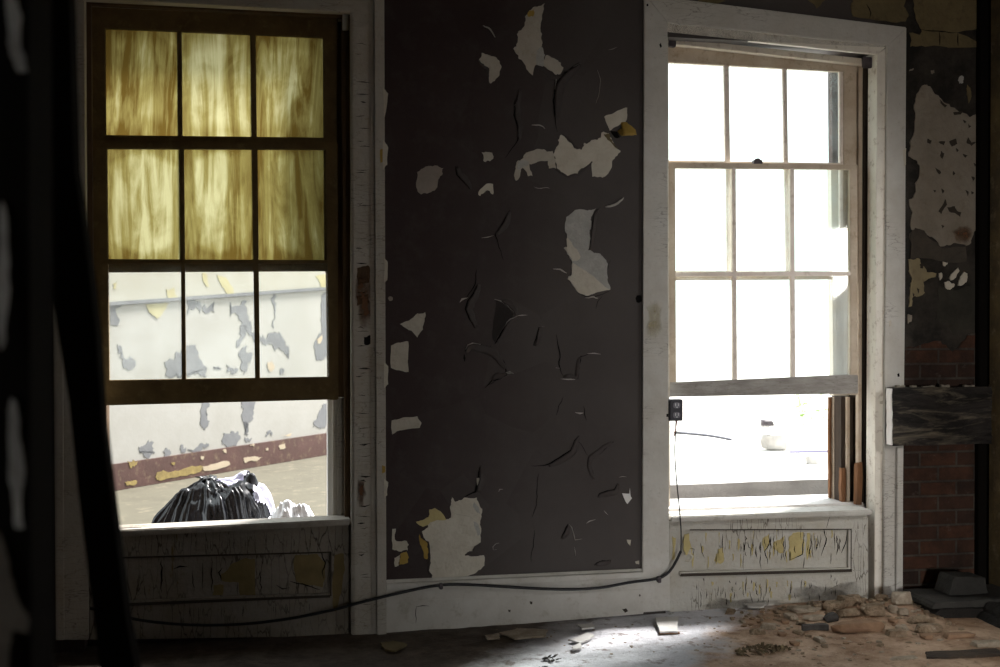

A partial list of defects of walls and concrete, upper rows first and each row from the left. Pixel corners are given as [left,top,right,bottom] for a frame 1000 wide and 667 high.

peeling [478,53,501,83]
peeling [514,3,565,89]
peeling [514,108,637,181]
peeling [109,305,122,326]
peeling [164,272,289,378]
peeling [313,274,327,361]
peeling [555,197,624,307]
flaking render [938,262,968,290]
spalling [127,402,292,481]
peeling [313,404,327,429]
crack [460,270,625,566]
peeling [392,498,485,578]